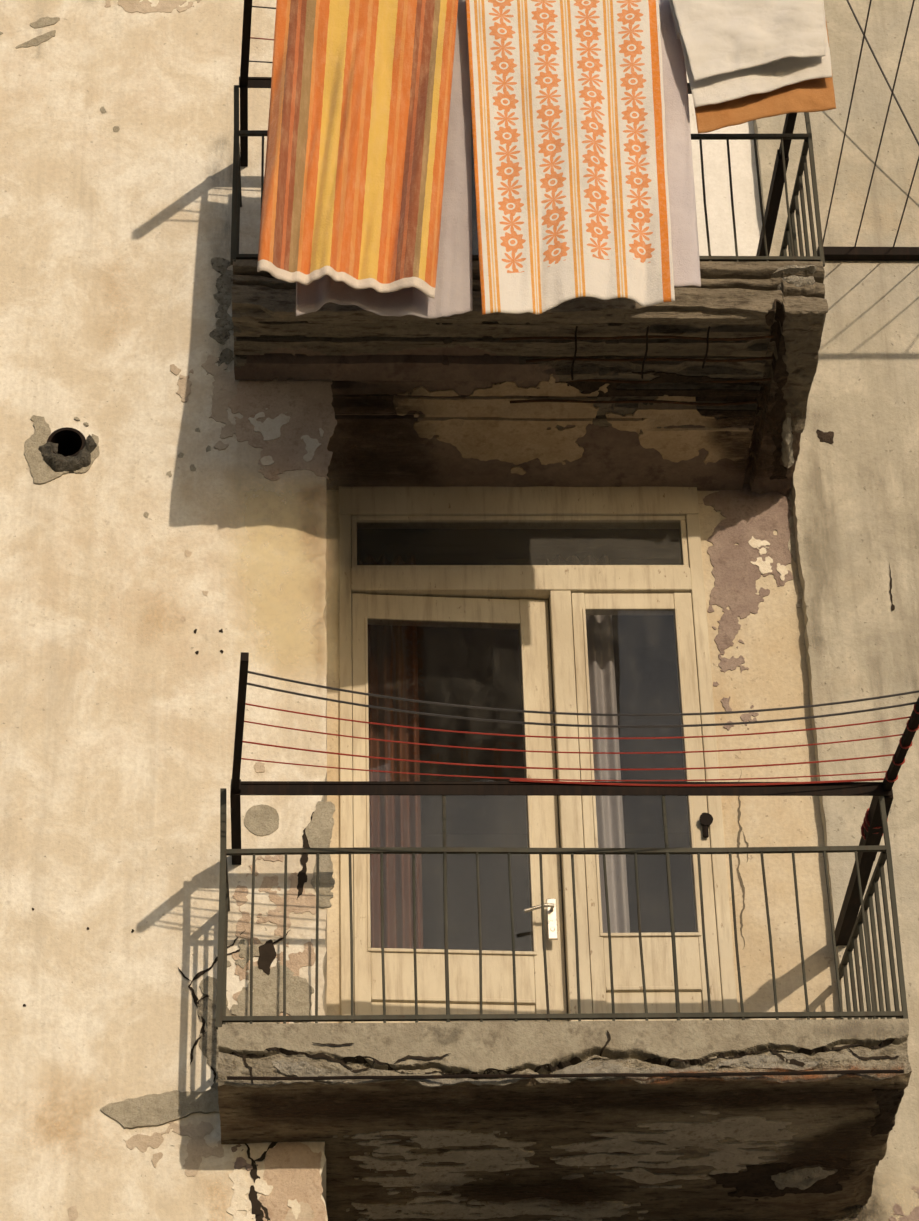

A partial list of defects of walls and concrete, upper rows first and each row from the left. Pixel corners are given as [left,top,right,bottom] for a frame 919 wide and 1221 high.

peeling [104,0,201,14]
peeling [170,257,337,481]
peeling [393,299,803,731]
spalling [197,801,904,1091]
crack [178,929,900,1083]
peeling [123,1121,327,1221]
crack [244,1142,278,1221]
peeling [333,1110,854,1221]
spalling [870,1089,904,1137]
peeling [888,1186,919,1221]